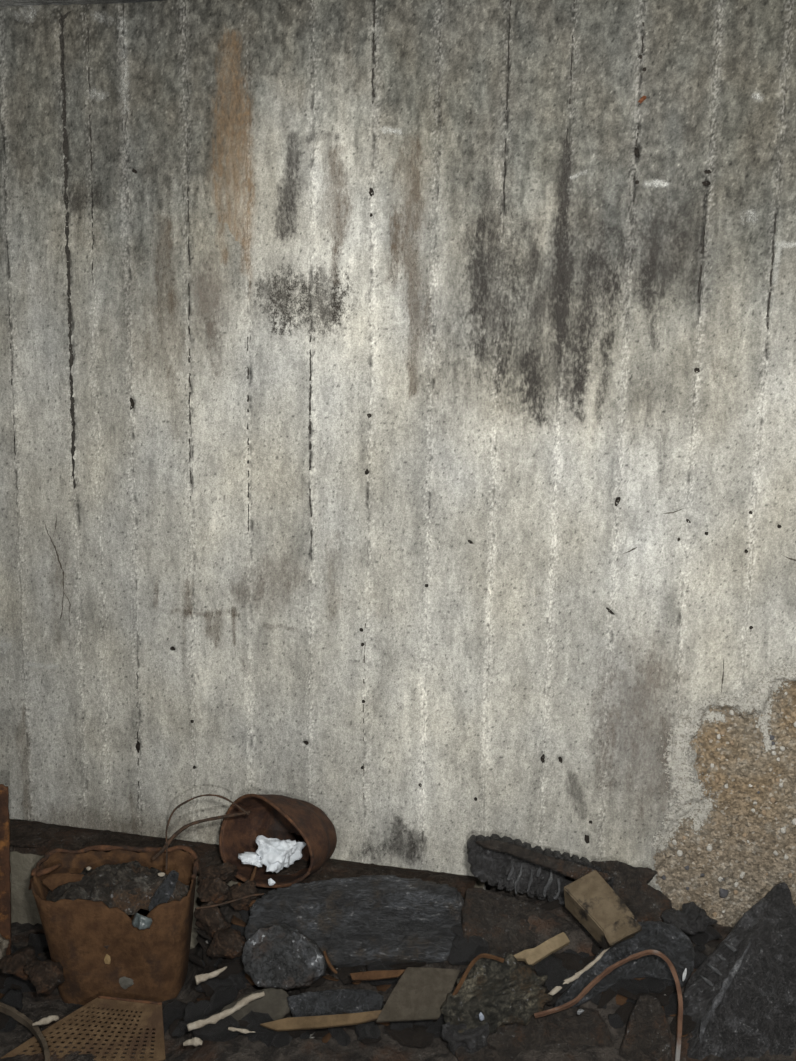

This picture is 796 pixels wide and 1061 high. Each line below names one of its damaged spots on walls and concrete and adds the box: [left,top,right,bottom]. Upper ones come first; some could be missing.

water stain [522,354,545,423]
water stain [554,140,586,420]
spalling [649,660,796,927]